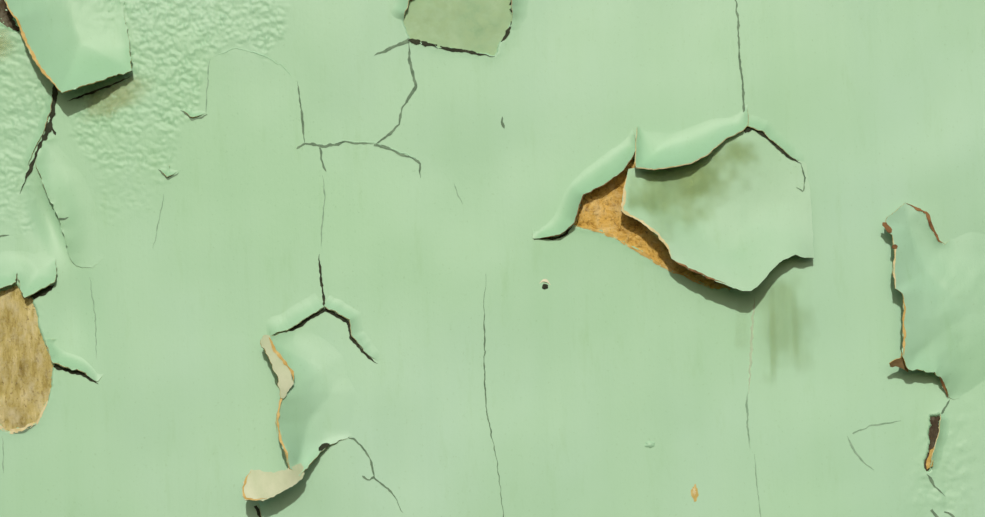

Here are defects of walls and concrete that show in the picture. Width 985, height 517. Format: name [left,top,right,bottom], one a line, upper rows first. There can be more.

crack [20,85,58,193]
peeling [0,0,132,101]
peeling [35,137,104,268]
crack [206,43,421,243]
peeling [375,0,528,57]
peeling [532,104,814,292]
peeling [0,246,103,434]
peeling [242,258,379,517]
crack [483,287,504,517]
crack [847,421,897,470]
peeling [882,202,985,472]